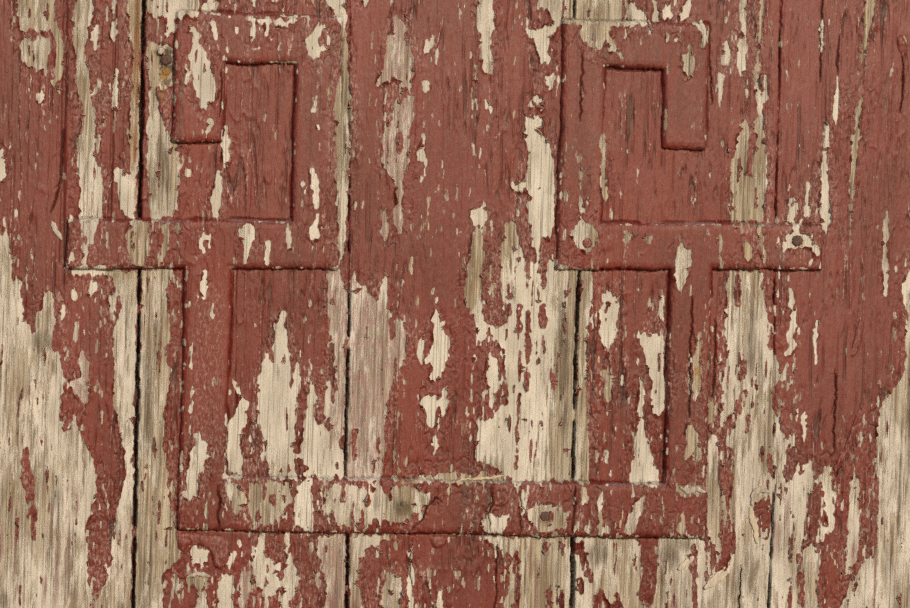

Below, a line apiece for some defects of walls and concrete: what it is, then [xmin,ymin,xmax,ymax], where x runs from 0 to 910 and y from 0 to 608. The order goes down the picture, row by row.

peeling [9,0,65,105]
peeling [458,0,495,131]
peeling [512,0,709,97]
peeling [198,270,215,319]
peeling [187,118,232,221]
peeling [229,220,282,269]
peeling [293,167,325,253]
peeling [369,12,445,241]
peeling [674,238,693,296]
peeling [715,0,847,270]
peeling [877,211,897,296]
peeling [417,288,450,455]